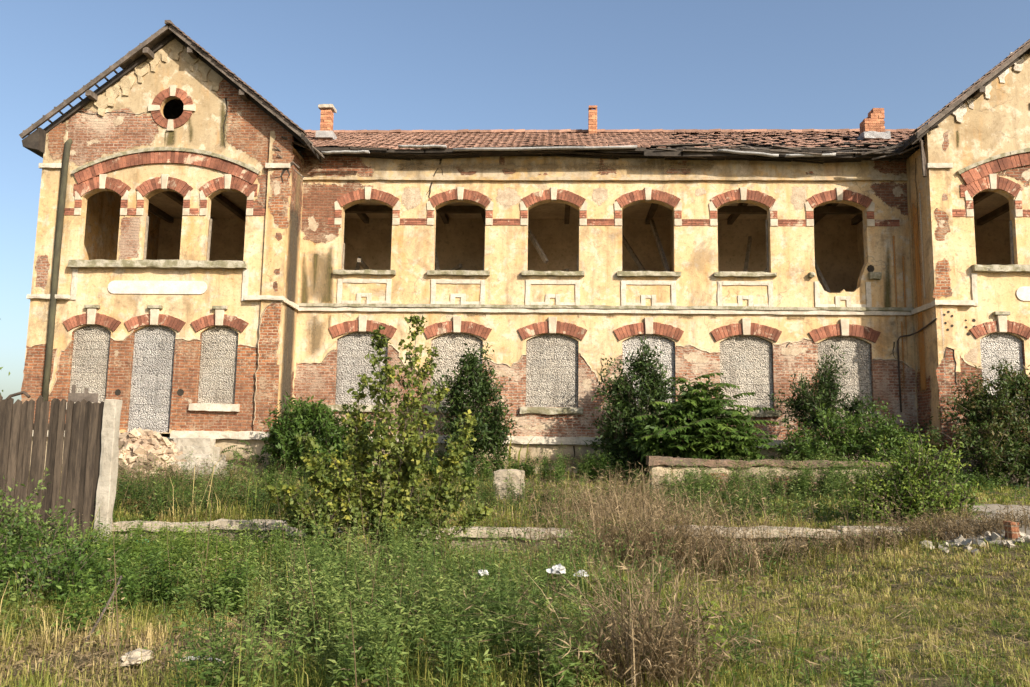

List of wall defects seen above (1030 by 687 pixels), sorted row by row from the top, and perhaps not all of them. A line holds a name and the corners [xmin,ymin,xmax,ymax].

flaking render [46,39,374,244]
flaking render [870,154,912,215]
flaking render [934,193,951,241]
flaking render [933,258,953,299]
flaking render [106,327,139,430]
flaking render [169,269,281,432]
flaking render [290,344,460,435]
flaking render [481,353,623,437]
flaking render [675,344,721,401]
flaking render [727,337,819,440]
flaking render [837,346,986,442]